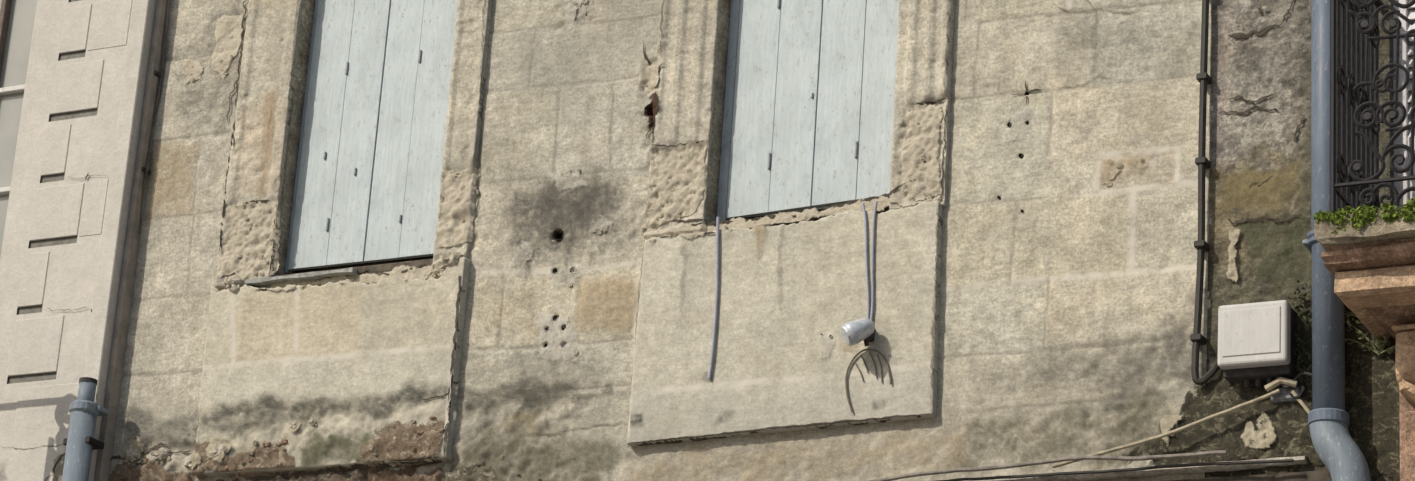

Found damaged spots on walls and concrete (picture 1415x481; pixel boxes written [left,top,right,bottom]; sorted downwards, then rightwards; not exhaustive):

rust [644,92,659,127]
crack [216,0,485,481]
crack [4,444,62,481]
crack [111,443,191,465]
peeling [108,416,542,481]